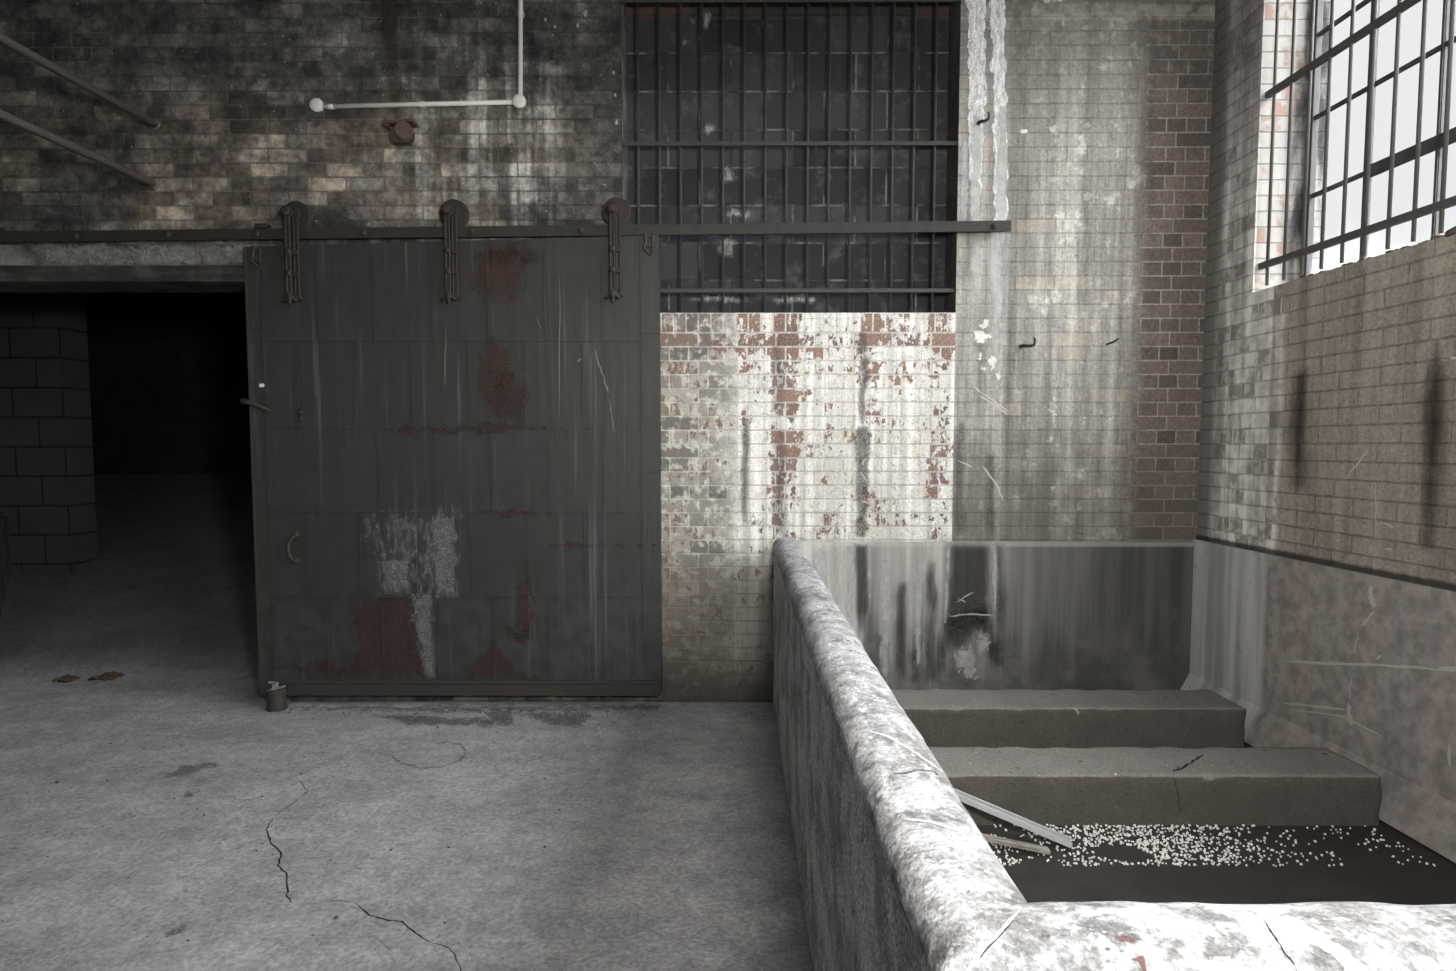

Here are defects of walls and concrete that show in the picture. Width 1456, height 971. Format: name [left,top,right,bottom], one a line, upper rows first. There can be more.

water stain [960,0,1009,397]
water stain [815,333,1004,678]
crack [266,783,308,903]
crack [331,900,461,971]
crack [1263,919,1297,971]